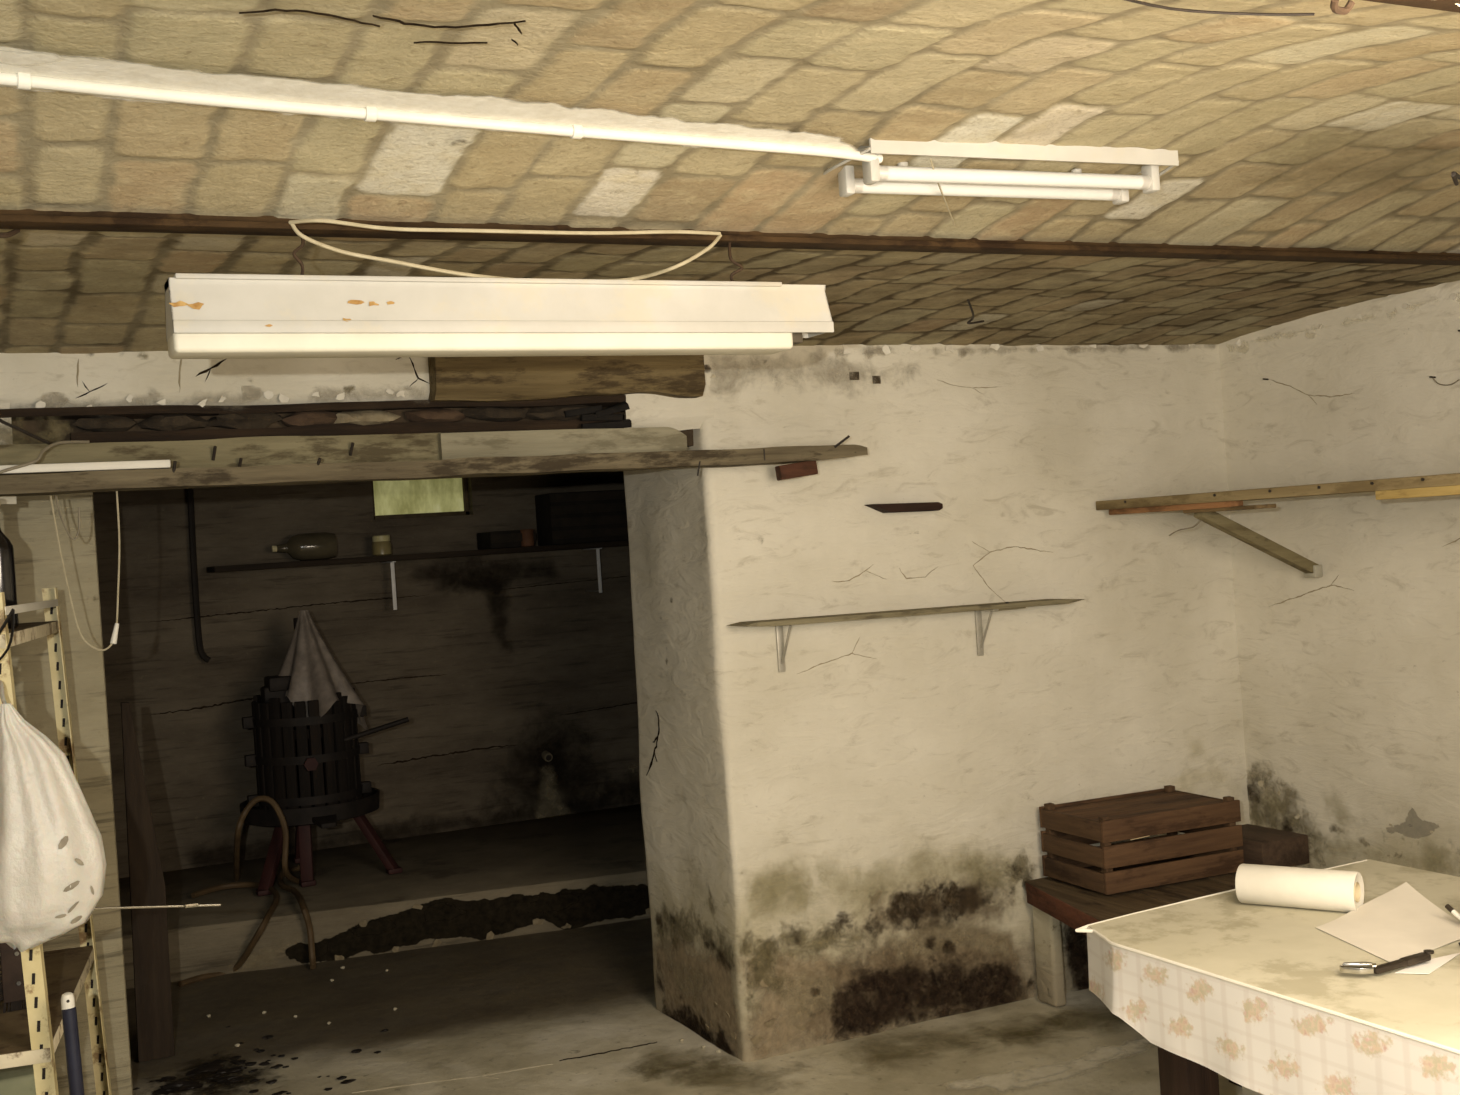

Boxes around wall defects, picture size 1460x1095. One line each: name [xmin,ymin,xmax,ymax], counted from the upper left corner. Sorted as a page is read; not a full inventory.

crack [239,8,526,46]
crack [833,566,936,582]
crack [972,541,1053,602]
leakage [1247,767,1318,853]
leakage [1012,857,1033,890]
leakage [656,883,1033,1060]
leakage [638,1002,737,1084]
leakage [986,1011,1125,1037]